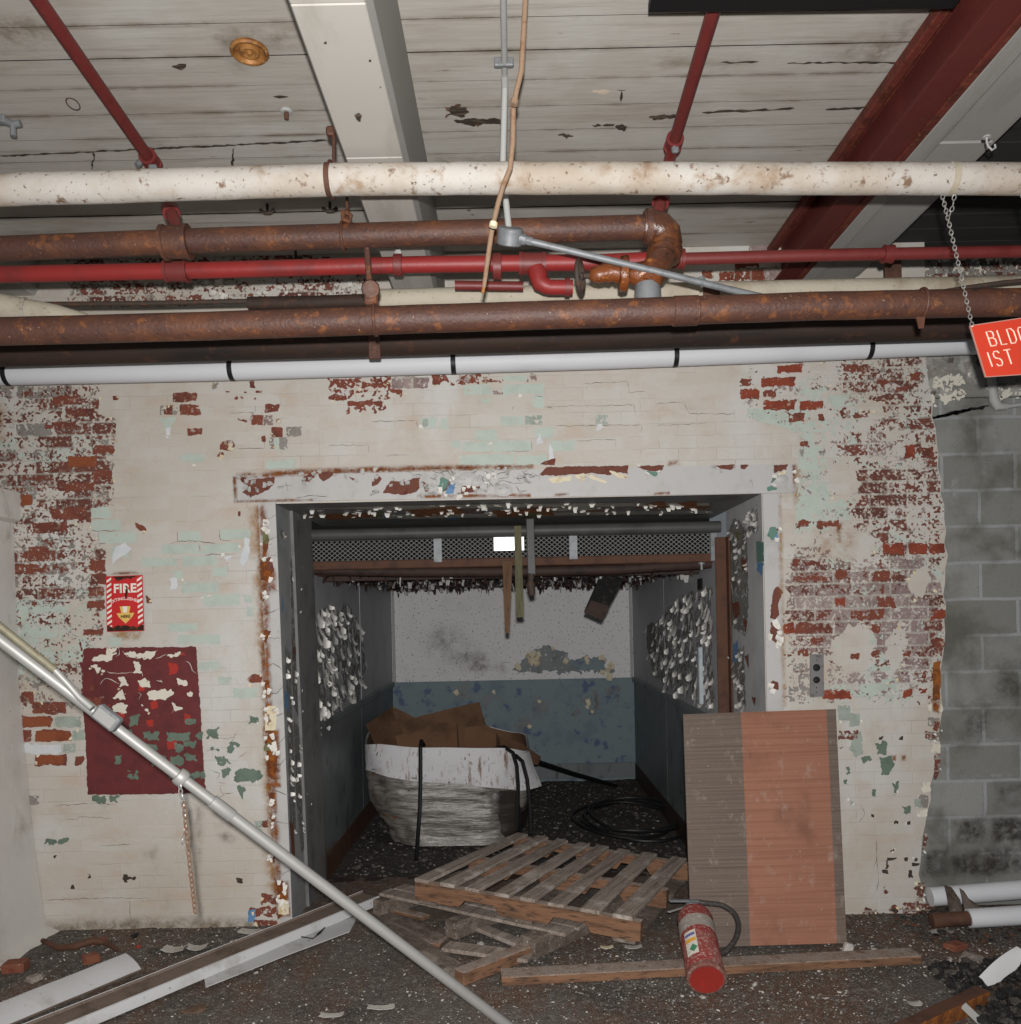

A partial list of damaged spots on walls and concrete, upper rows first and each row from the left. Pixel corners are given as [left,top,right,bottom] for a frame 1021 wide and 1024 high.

crack [2,139,327,170]
peeling [211,373,713,521]
crack [932,405,989,419]
peeling [0,384,312,858]
corrosion [255,499,294,840]
peeling [316,603,367,736]
peeling [322,575,603,597]
peeling [512,645,615,681]
peeling [616,569,714,710]
peeling [727,357,973,825]
corrosion [270,858,290,916]
damp [927,819,1021,873]